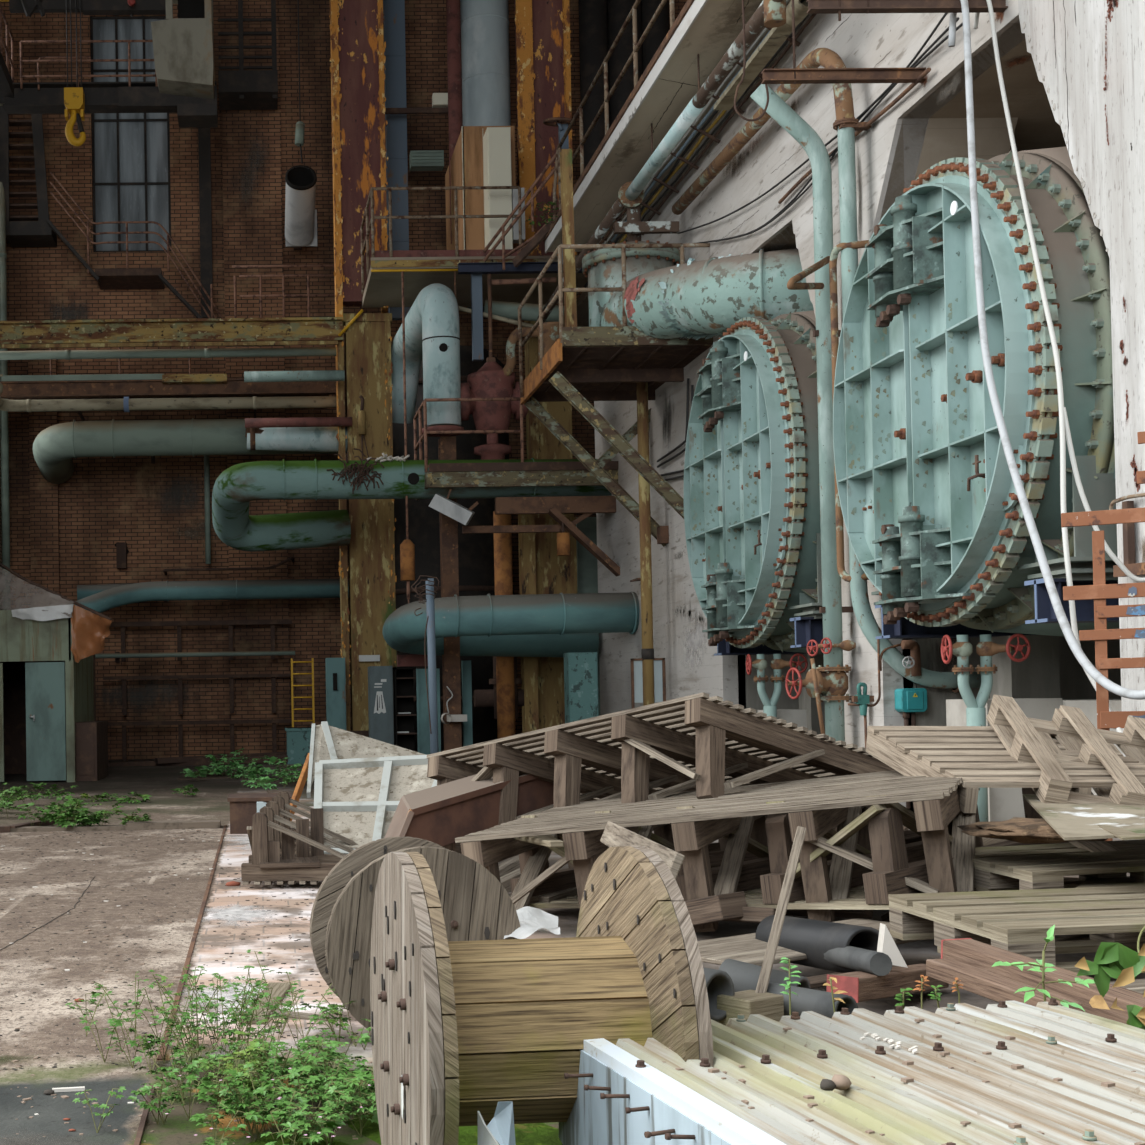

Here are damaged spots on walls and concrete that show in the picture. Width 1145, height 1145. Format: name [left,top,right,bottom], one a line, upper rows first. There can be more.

corrosion [329,0,345,302]
corrosion [376,0,388,251]
peeling [657,258,721,340]
crack [0,876,95,950]